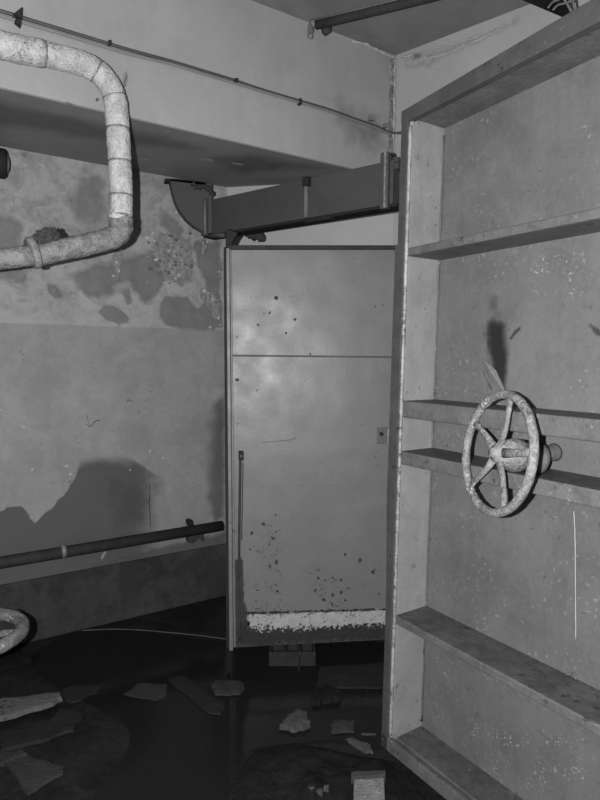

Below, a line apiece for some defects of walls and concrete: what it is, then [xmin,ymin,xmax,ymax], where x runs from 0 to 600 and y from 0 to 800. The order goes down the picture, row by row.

flaking render [144,228,193,285]